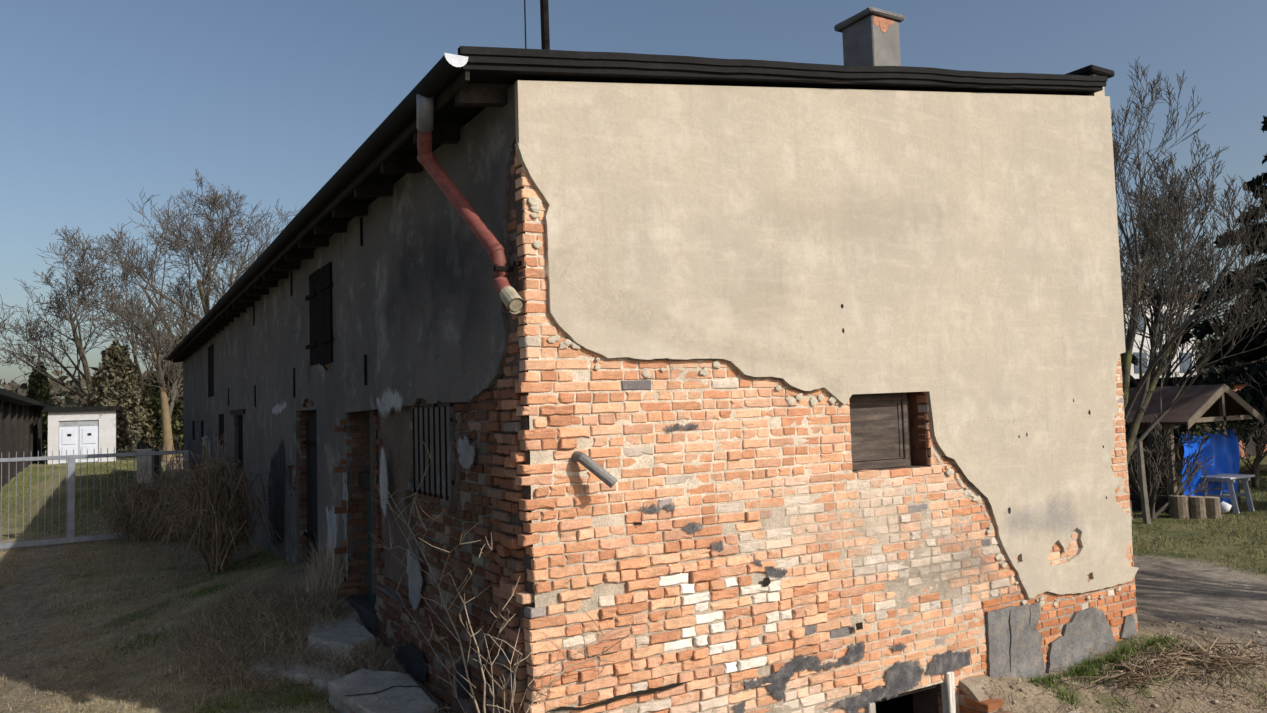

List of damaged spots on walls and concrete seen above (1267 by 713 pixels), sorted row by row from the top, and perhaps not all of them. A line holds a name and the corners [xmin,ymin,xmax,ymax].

flaking render [369,148,1058,713]
flaking render [1048,529,1080,565]
flaking render [1103,354,1134,567]